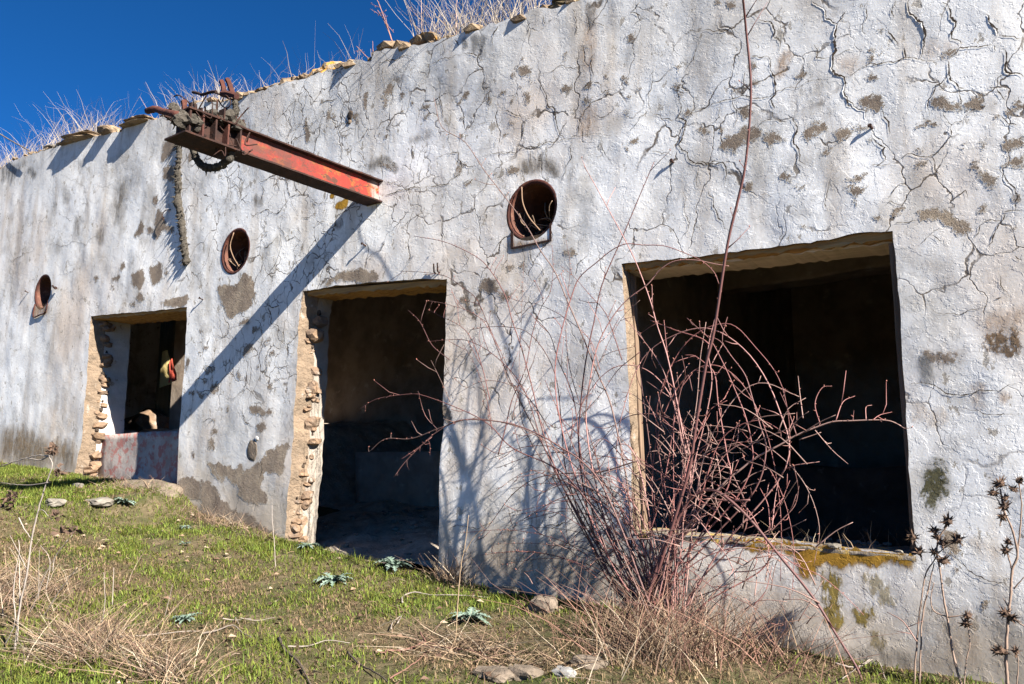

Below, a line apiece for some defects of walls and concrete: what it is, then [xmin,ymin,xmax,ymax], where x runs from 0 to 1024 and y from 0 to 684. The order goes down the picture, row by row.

crack [293,0,1023,247]
spalling [75,261,189,476]
crack [194,167,362,428]
spalling [178,267,447,543]
damp [920,459,949,509]
crack [911,382,1023,415]
crack [933,256,1021,315]